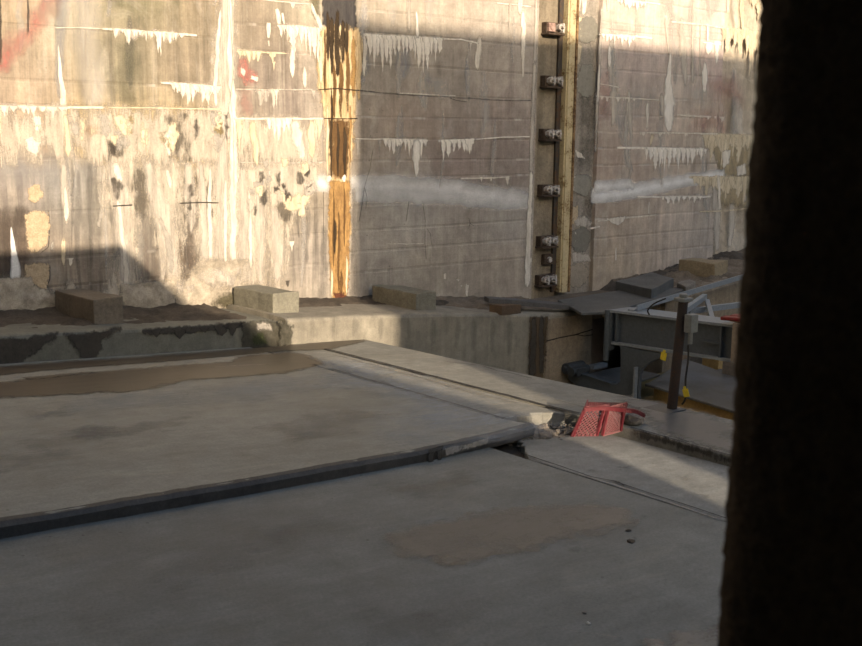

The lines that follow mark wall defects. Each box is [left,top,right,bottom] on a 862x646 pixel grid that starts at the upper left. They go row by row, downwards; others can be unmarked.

peeling [24,184,54,290]
damp [0,319,365,398]
damp [0,0,482,296]
peeling [248,158,314,216]
corrosion [316,10,368,298]
damp [352,0,538,287]
damp [590,0,761,250]